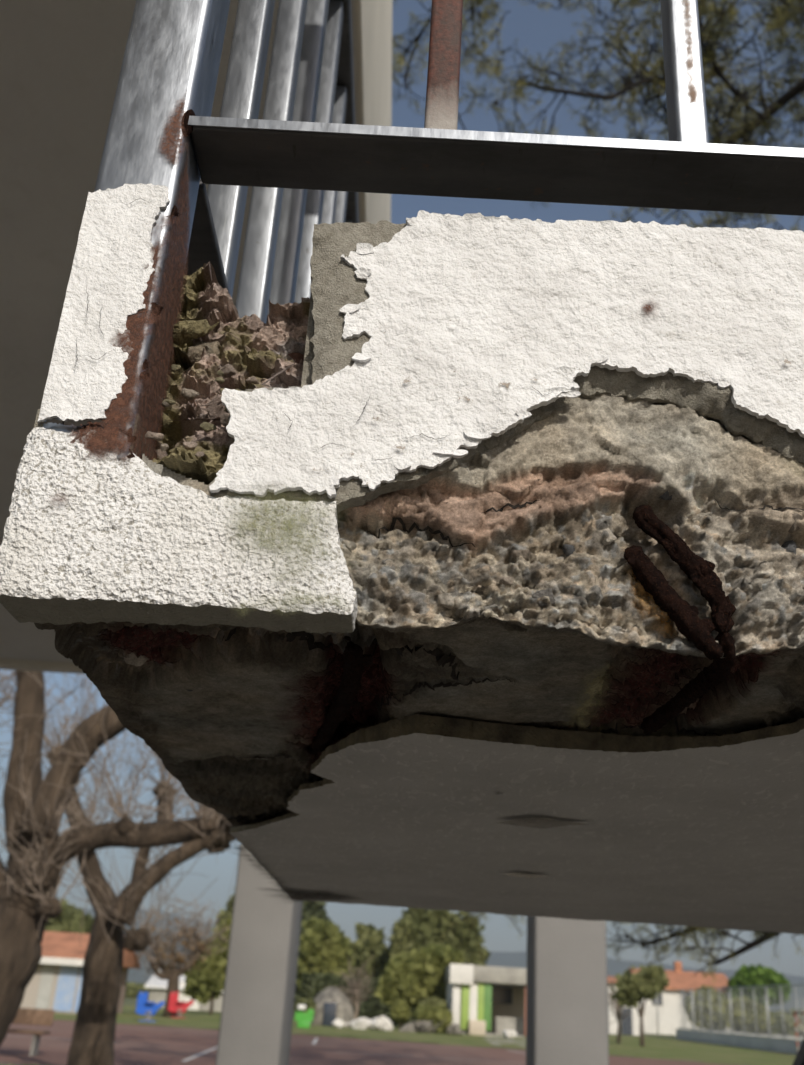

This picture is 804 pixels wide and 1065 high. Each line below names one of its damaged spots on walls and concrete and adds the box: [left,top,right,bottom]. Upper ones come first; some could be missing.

rust [682,0,698,103]
rust [70,99,195,460]
peeling [340,304,360,314]
peeling [354,243,374,280]
spalling [142,261,311,496]
crack [366,517,475,547]
crack [483,500,539,513]
crack [714,488,804,511]
spalling [34,366,804,827]
rust [102,625,209,664]
crack [373,638,515,709]
rust [592,648,692,727]